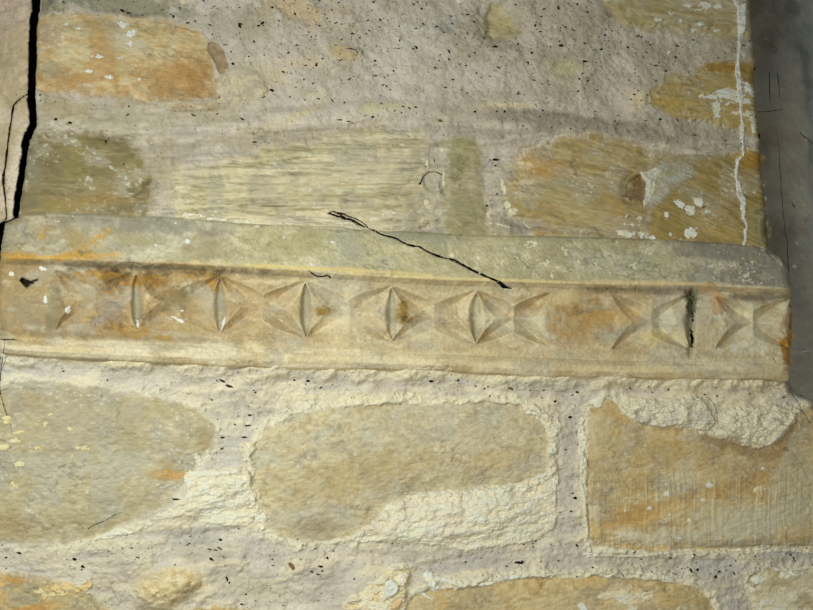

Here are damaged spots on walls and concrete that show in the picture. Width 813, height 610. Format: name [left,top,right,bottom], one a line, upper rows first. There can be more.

damp [684,1,722,35]
crack [0,0,41,259]
damp [698,0,775,286]
crack [328,211,512,290]
crack [0,339,16,430]